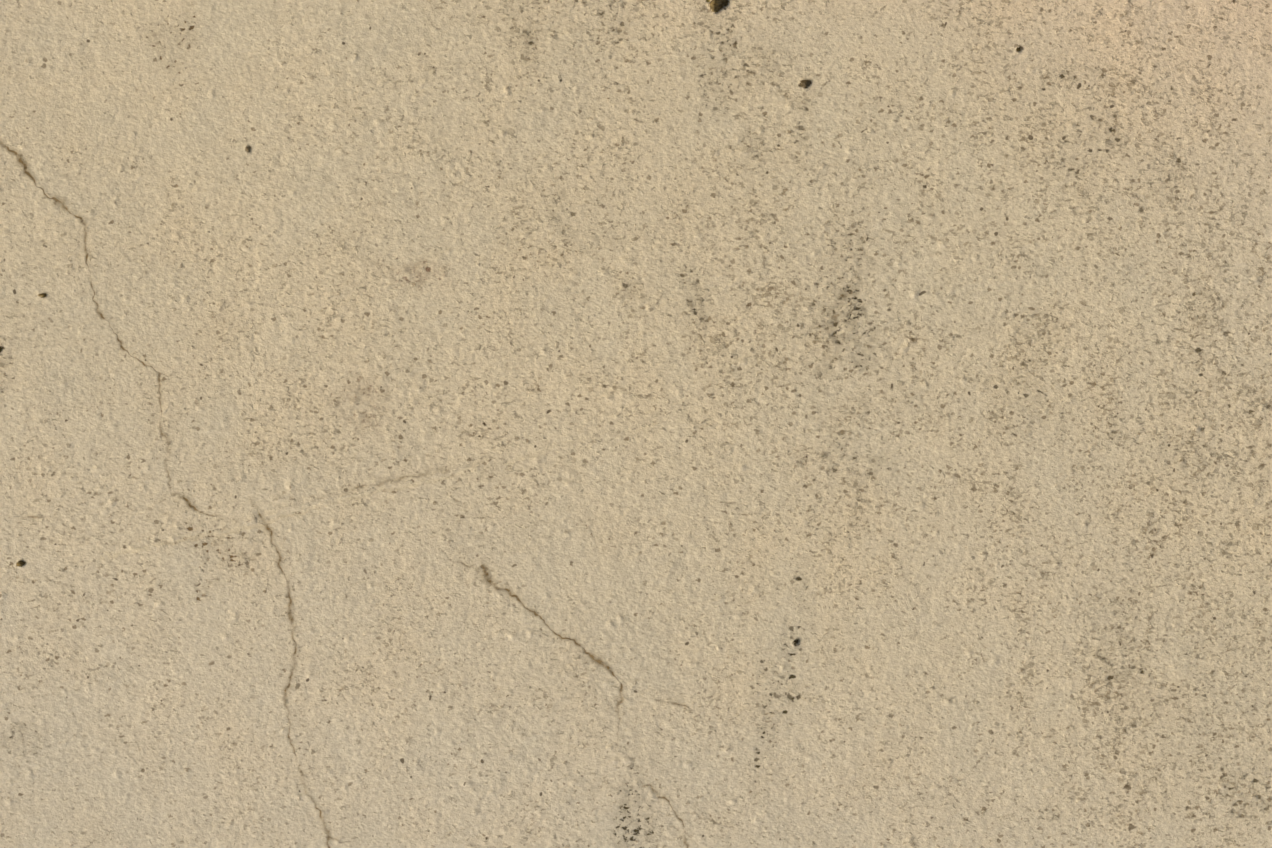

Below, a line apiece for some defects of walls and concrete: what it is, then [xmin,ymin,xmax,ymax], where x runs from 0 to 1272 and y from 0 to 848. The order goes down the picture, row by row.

crack [5,146,162,434]
crack [183,497,213,516]
crack [259,514,297,697]
crack [464,564,623,706]